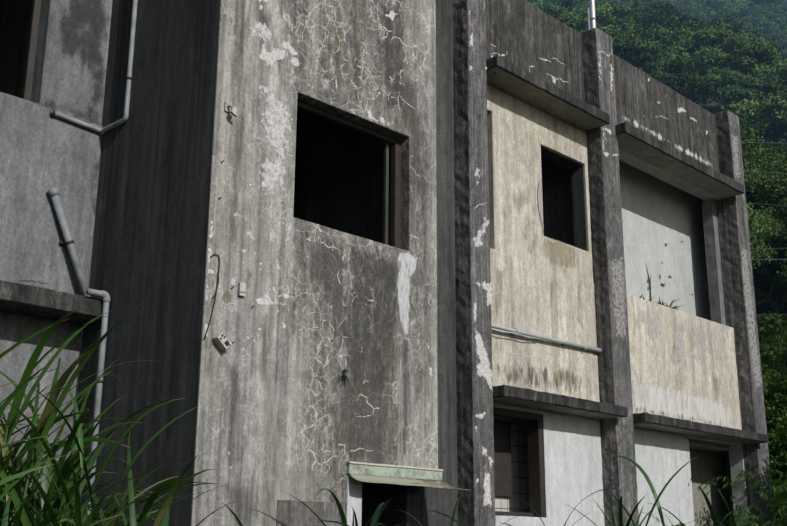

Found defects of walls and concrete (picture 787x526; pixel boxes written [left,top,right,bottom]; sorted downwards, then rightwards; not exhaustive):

peeling [245,22,299,67]
crack [267,0,428,110]
peeling [249,81,293,197]
peeling [269,223,292,247]
crack [302,235,374,365]
peeling [397,252,417,336]
peeling [476,281,493,307]
peeling [473,302,494,390]
crack [356,372,380,417]
damp [498,365,578,389]
crack [296,443,372,474]